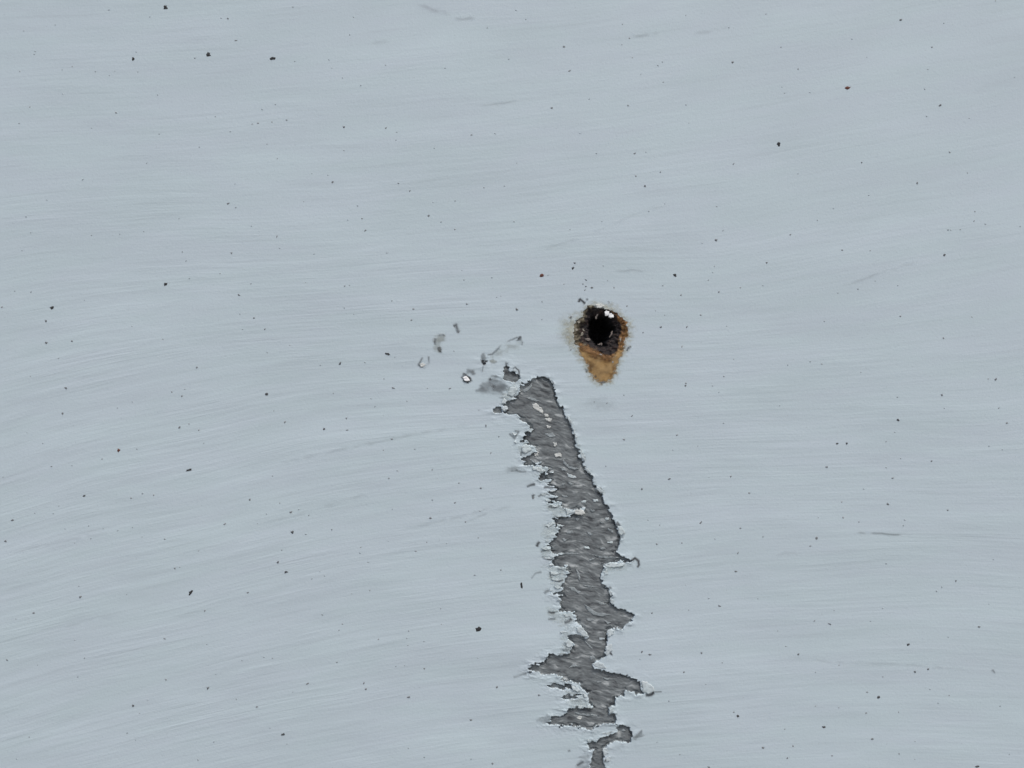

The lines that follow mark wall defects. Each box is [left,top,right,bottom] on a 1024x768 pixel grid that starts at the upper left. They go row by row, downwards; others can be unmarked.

corrosion [567,322,630,383]
peeling [493,364,654,768]